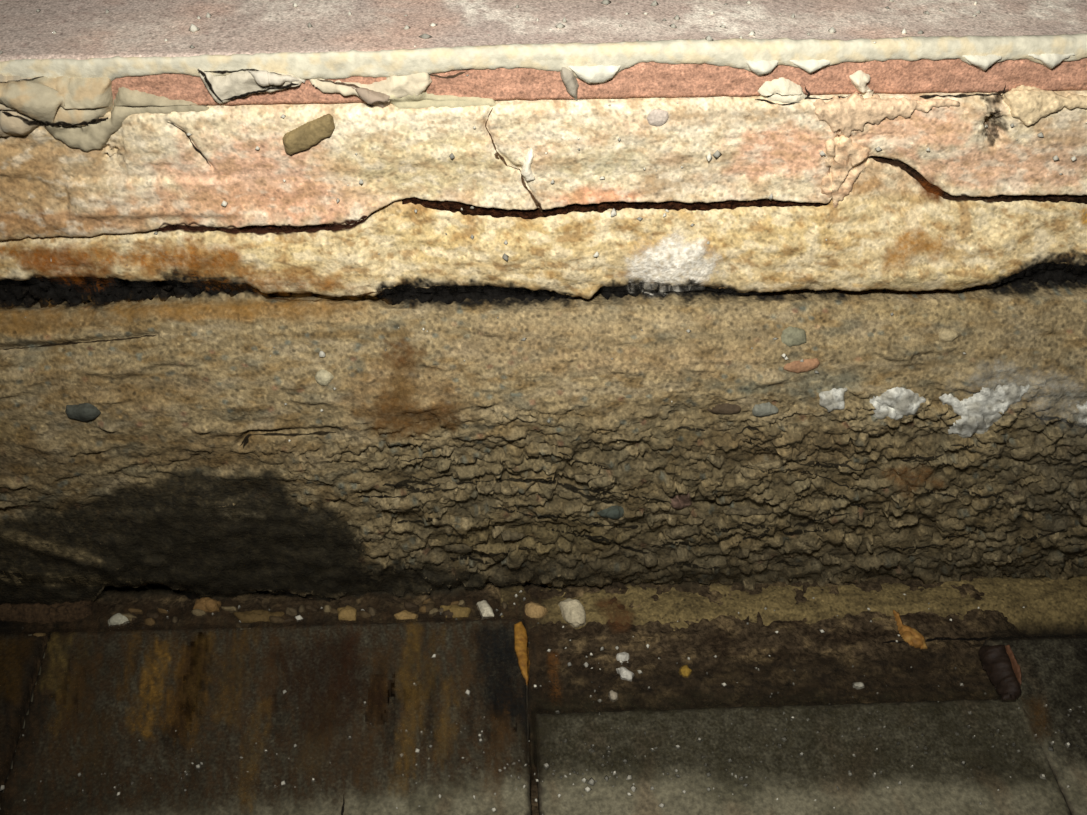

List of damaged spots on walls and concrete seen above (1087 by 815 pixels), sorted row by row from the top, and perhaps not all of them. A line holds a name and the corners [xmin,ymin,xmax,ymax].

peeling [198,68,432,108]
crack [755,84,873,106]
crack [168,122,211,166]
crack [402,108,828,220]
crack [869,156,1087,204]
crack [155,211,375,235]
damp [819,388,847,412]
damp [869,387,926,421]
damp [939,382,1030,438]
damp [1076,401,1087,424]
crack [358,477,671,504]
damp [0,470,1087,815]